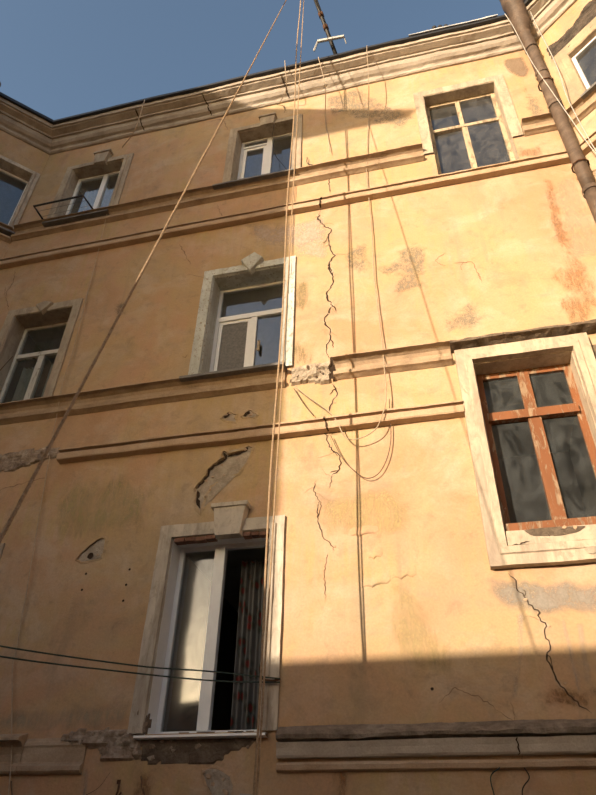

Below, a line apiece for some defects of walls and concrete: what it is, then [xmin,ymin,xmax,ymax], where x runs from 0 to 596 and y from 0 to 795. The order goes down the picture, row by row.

spalling [220,409,259,424]
crack [310,179,342,594]
spalling [193,444,255,517]
spalling [75,536,109,564]
leakage [498,584,596,611]
crack [508,573,591,713]
spalling [128,722,256,765]
crack [438,687,523,760]